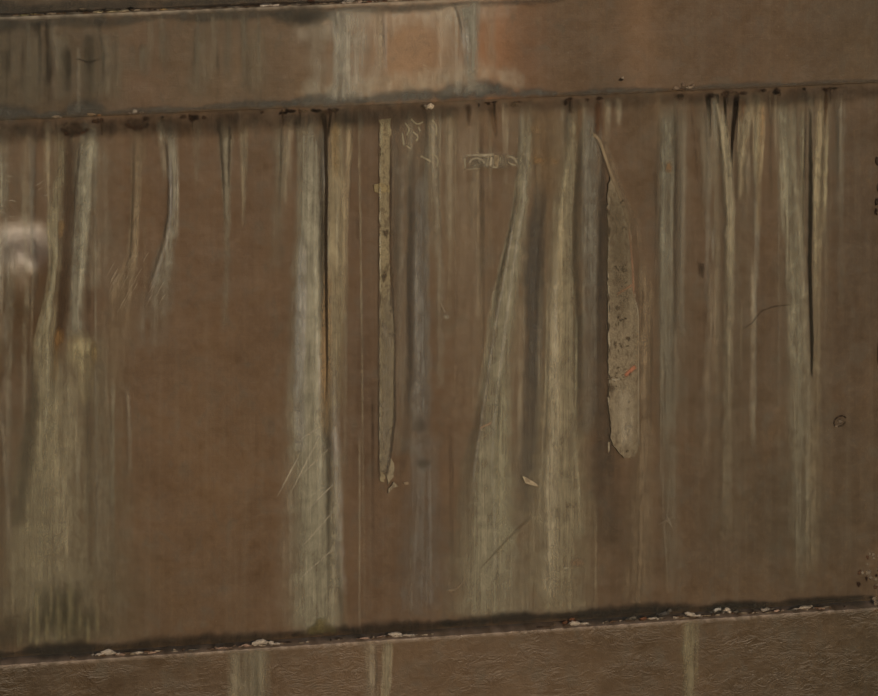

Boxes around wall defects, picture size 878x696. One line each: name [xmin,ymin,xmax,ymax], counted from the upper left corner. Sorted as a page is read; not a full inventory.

leakage [25,142,94,611]
leakage [157,135,178,283]
leakage [171,0,555,219]
peeling [373,118,409,493]
leakage [294,110,863,636]
peeling [593,134,639,458]
crack [808,94,828,373]
leakage [23,644,95,658]